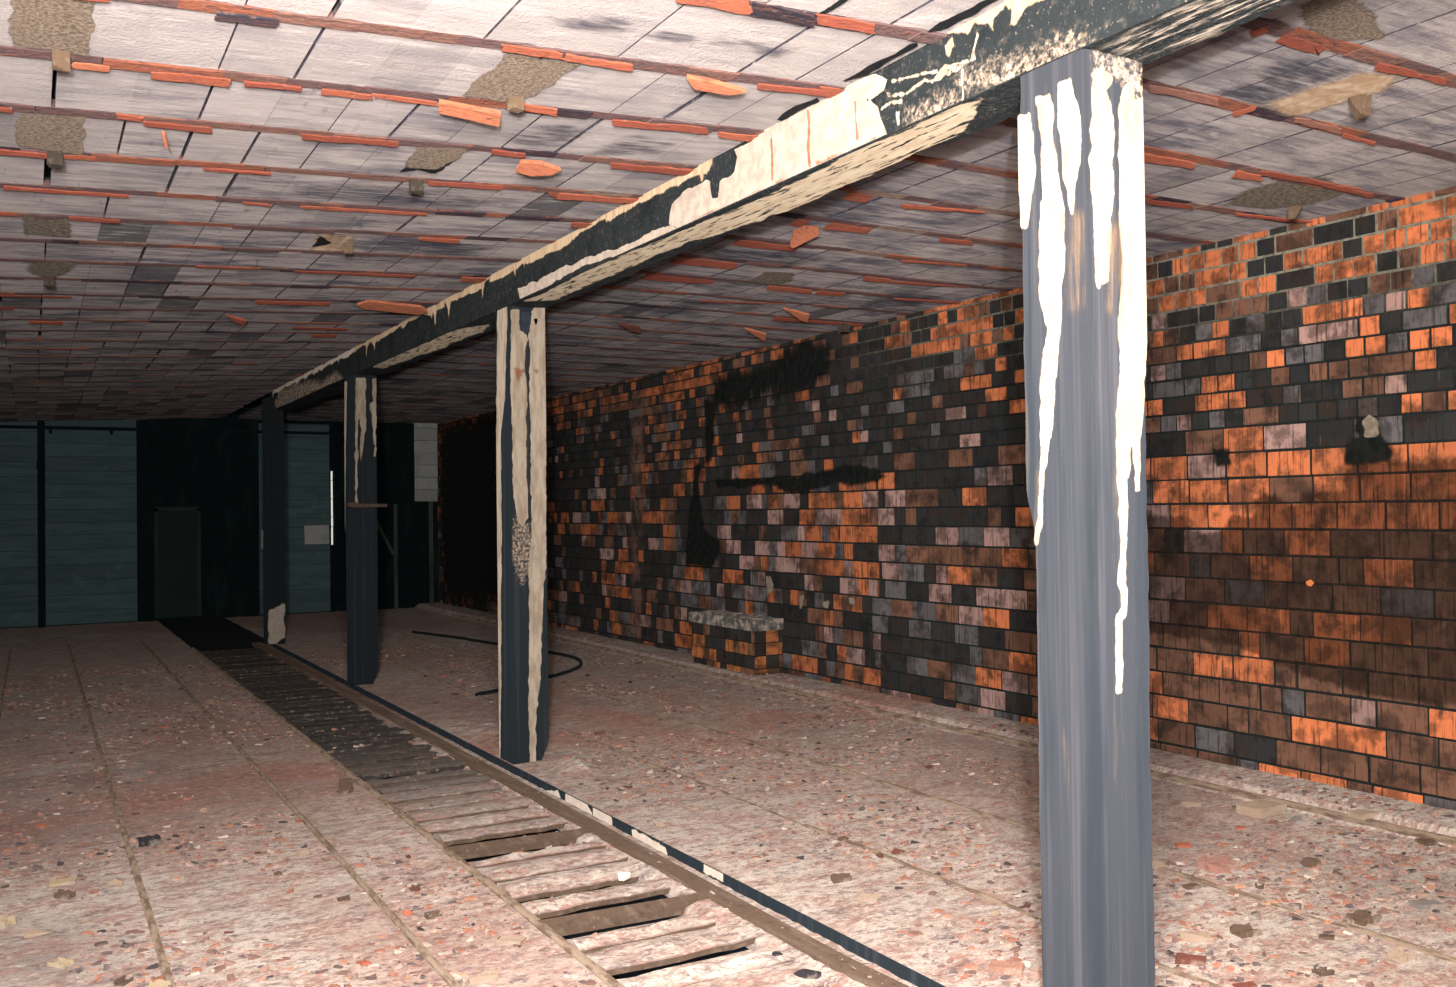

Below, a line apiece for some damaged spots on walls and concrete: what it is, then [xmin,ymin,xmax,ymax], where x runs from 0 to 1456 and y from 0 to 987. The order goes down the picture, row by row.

spalling [8,0,110,72]
peeling [214,11,279,28]
peeling [151,72,302,92]
peeling [321,88,438,106]
spalling [464,44,633,116]
spalling [301,133,503,190]
spalling [507,0,1447,333]
water stain [273,158,713,396]
peeling [373,324,489,368]
water stain [1018,69,1147,694]
water stain [344,377,377,502]
water stain [439,307,547,762]